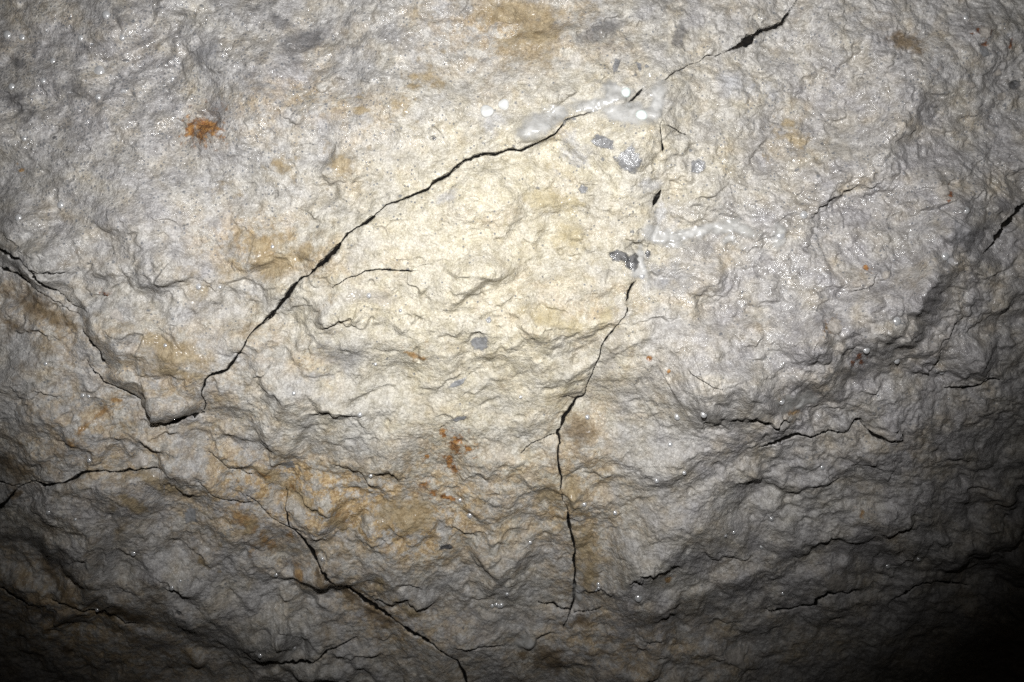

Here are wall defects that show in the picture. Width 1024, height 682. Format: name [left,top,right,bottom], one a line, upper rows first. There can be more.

crack [628,0,797,103]
rust [179,116,220,141]
water stain [517,82,665,140]
crack [660,121,686,153]
crack [653,190,661,205]
crack [983,203,1024,254]
crack [167,109,598,425]
crack [0,248,137,396]
crack [521,282,634,628]
crack [0,467,163,509]
crack [200,452,468,682]